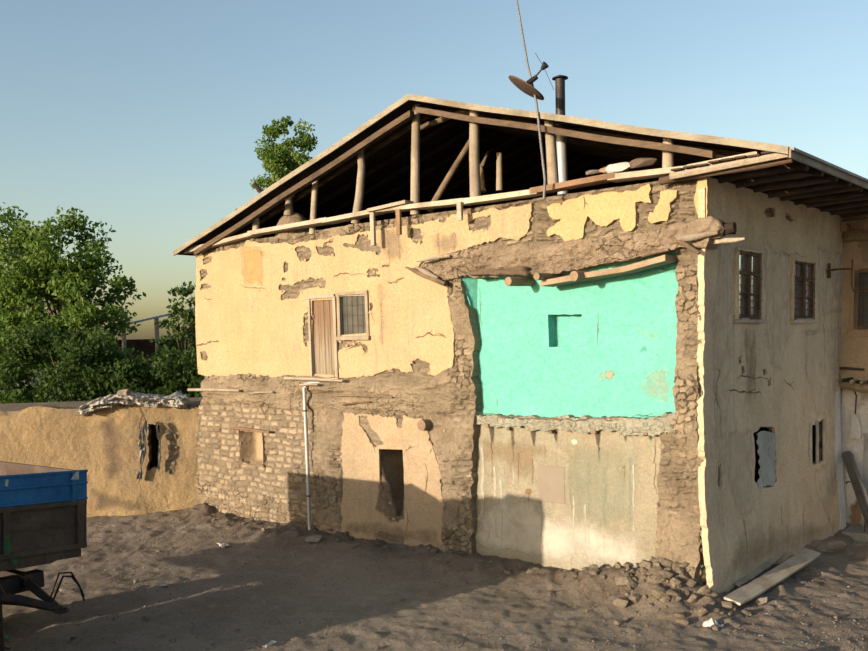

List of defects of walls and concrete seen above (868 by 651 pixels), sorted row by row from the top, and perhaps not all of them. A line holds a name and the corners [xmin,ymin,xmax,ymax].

spalling [469,215,491,233]
spalling [410,228,424,244]